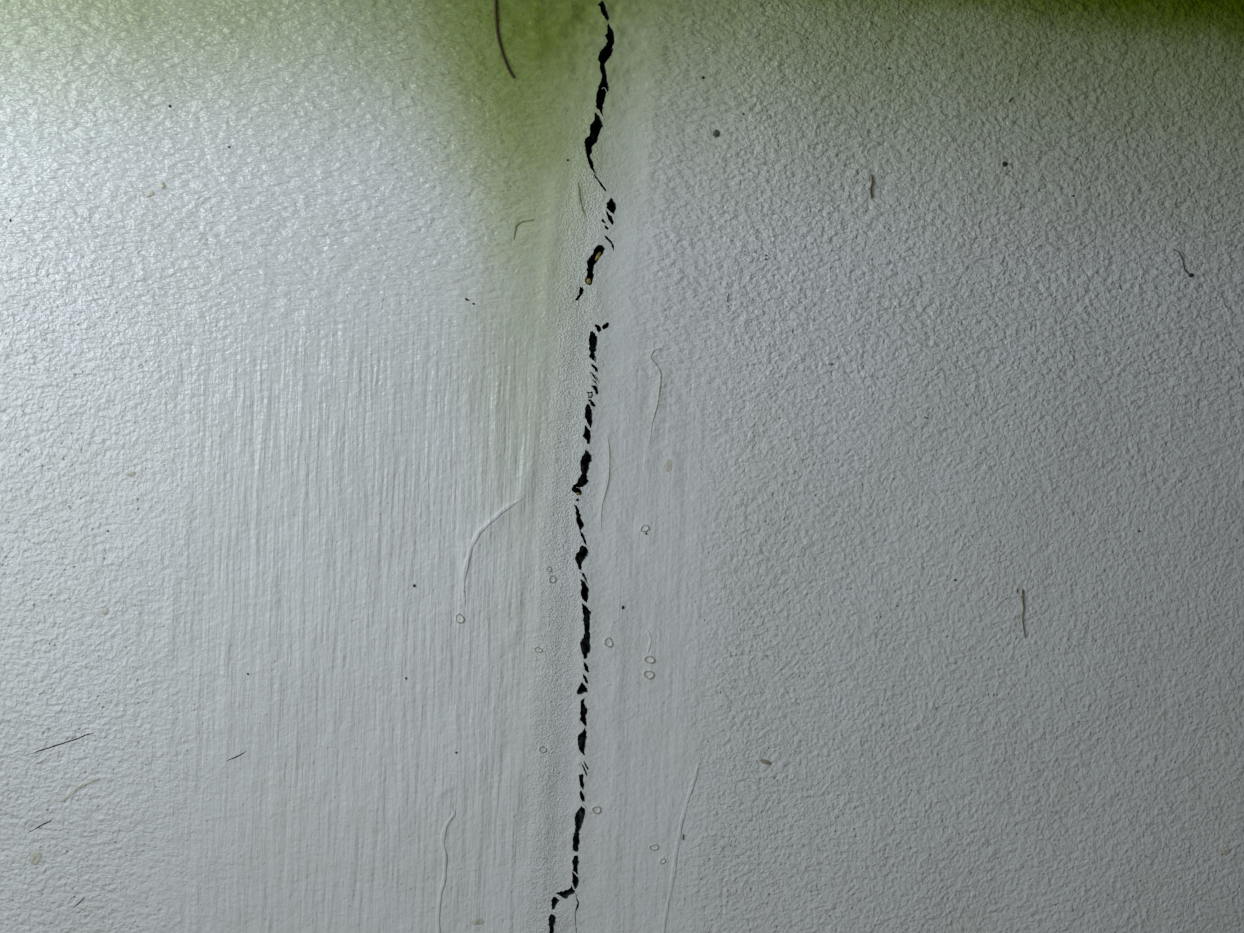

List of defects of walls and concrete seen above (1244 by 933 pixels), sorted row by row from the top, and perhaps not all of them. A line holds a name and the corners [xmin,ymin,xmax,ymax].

crack [548,0,616,933]
damp [1018,0,1244,38]